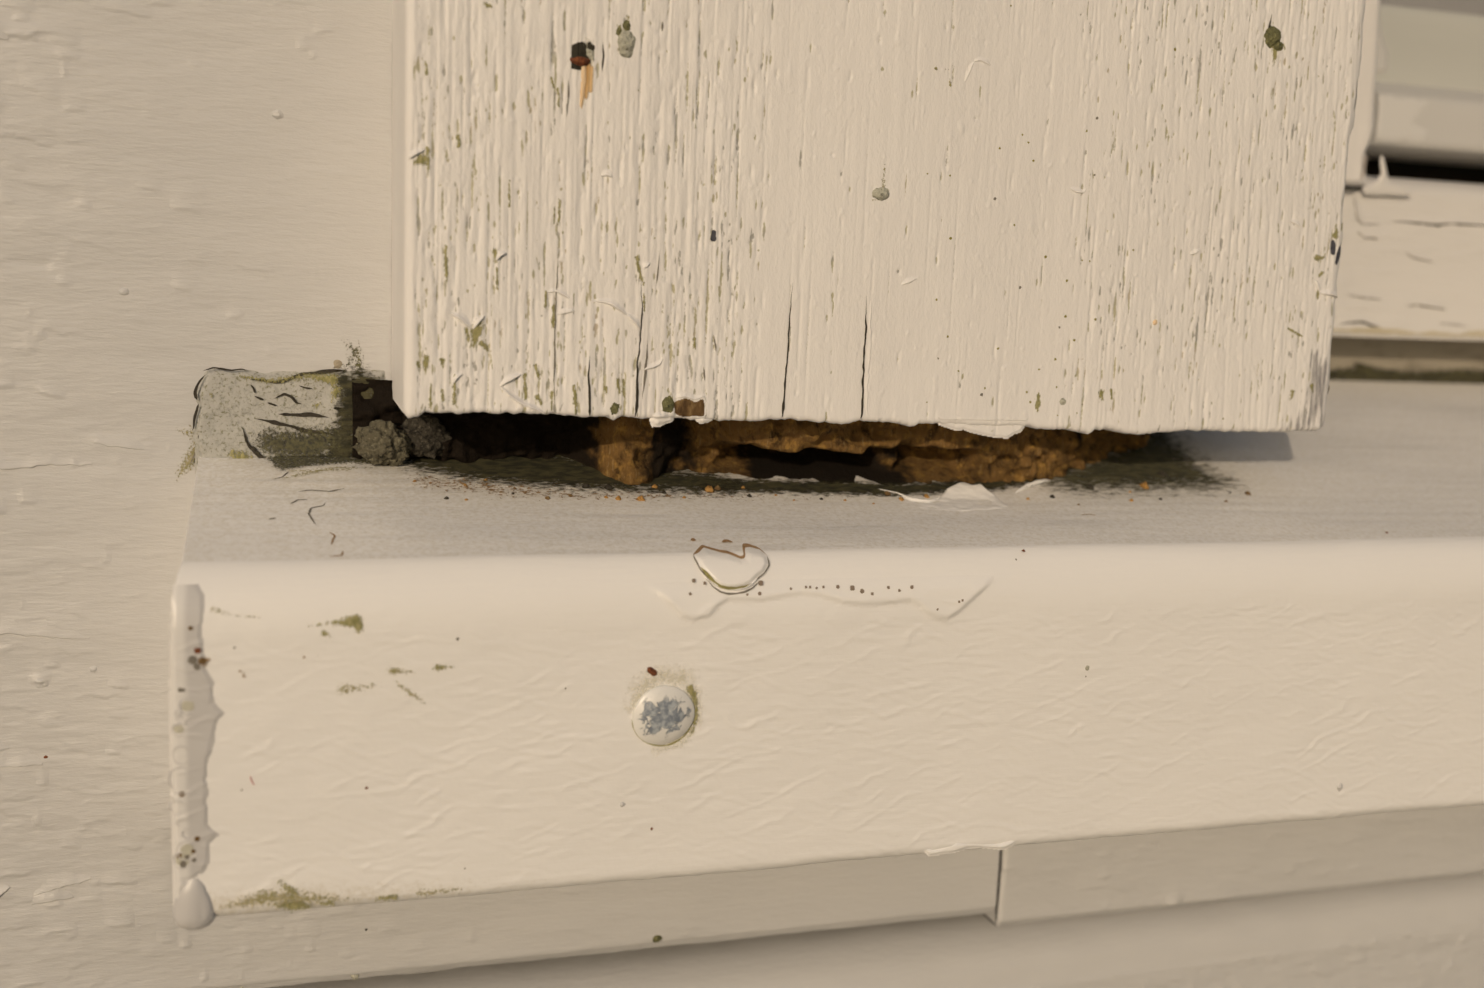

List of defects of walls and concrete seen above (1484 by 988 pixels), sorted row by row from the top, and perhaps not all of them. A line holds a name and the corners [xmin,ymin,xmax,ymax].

corrosion [585,64,593,98]
spalling [649,389,713,428]
leakage [229,340,1245,498]
peeling [938,417,1028,439]